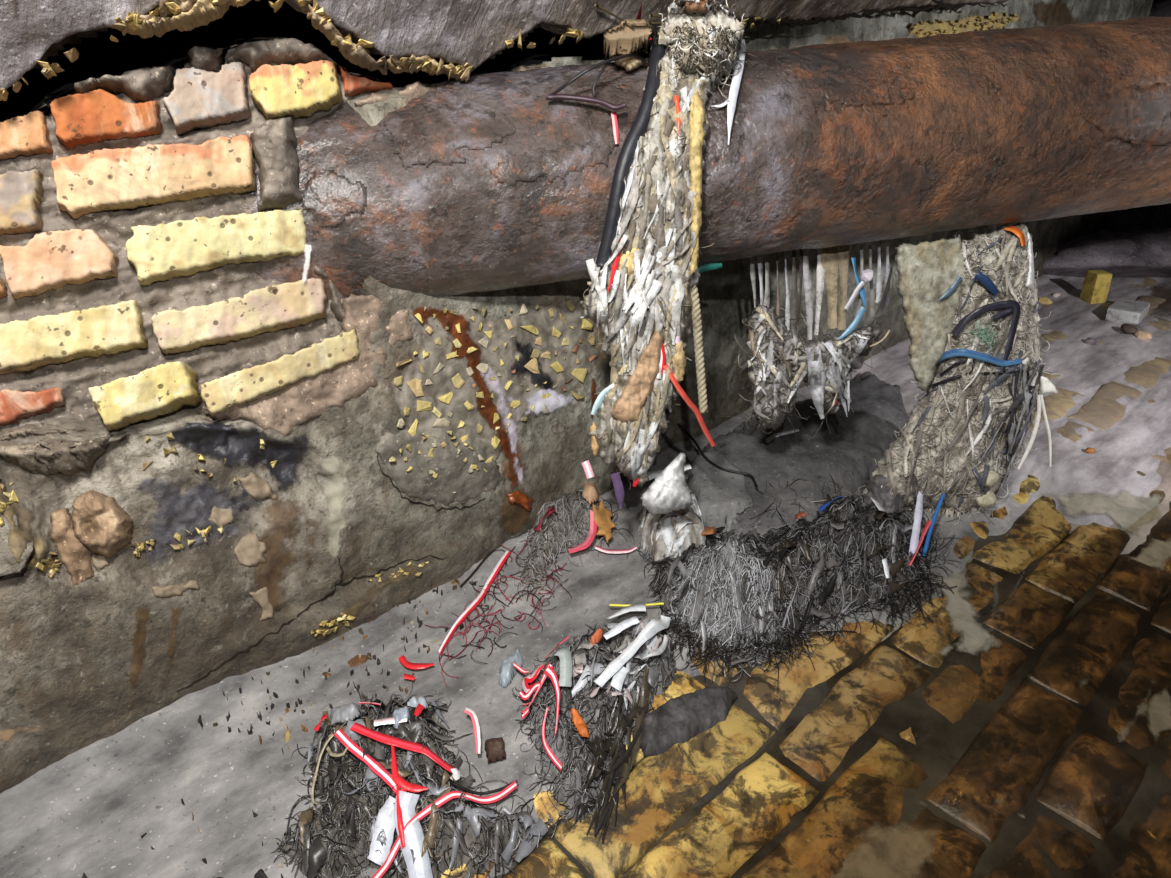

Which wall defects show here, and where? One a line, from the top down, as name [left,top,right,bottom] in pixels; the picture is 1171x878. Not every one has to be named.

spalling [0,77,28,101]
spalling [36,48,79,80]
spalling [110,0,474,83]
crack [0,0,609,122]
spalling [505,28,584,49]
crack [640,43,651,59]
spalling [143,432,178,470]
corrosion [413,307,534,533]
spalling [0,478,60,578]
spalling [128,539,155,557]
leakage [142,479,299,608]
leakage [312,458,349,556]